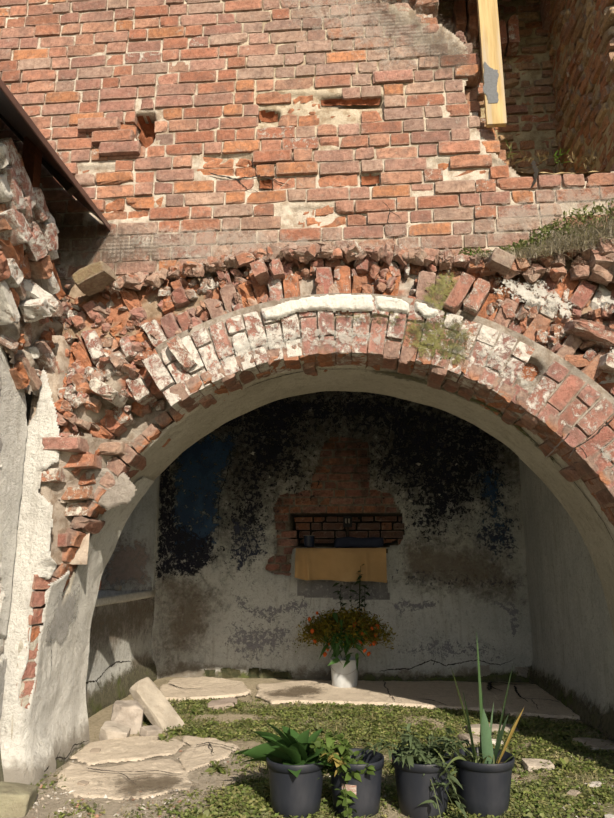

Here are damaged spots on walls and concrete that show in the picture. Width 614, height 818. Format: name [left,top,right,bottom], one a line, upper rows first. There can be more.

spalling [0,137,614,516]
peeling [155,391,526,679]
flaking render [16,574,57,709]
crack [86,661,131,688]
crack [379,658,563,709]